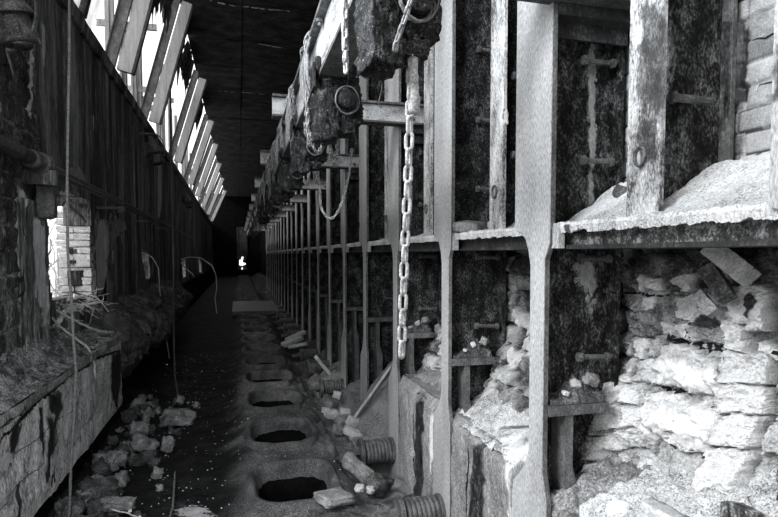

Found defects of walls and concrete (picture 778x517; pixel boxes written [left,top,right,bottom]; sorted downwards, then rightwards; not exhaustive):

water stain [111,351,121,412]
water stain [39,390,69,488]
crack [463,447,471,514]